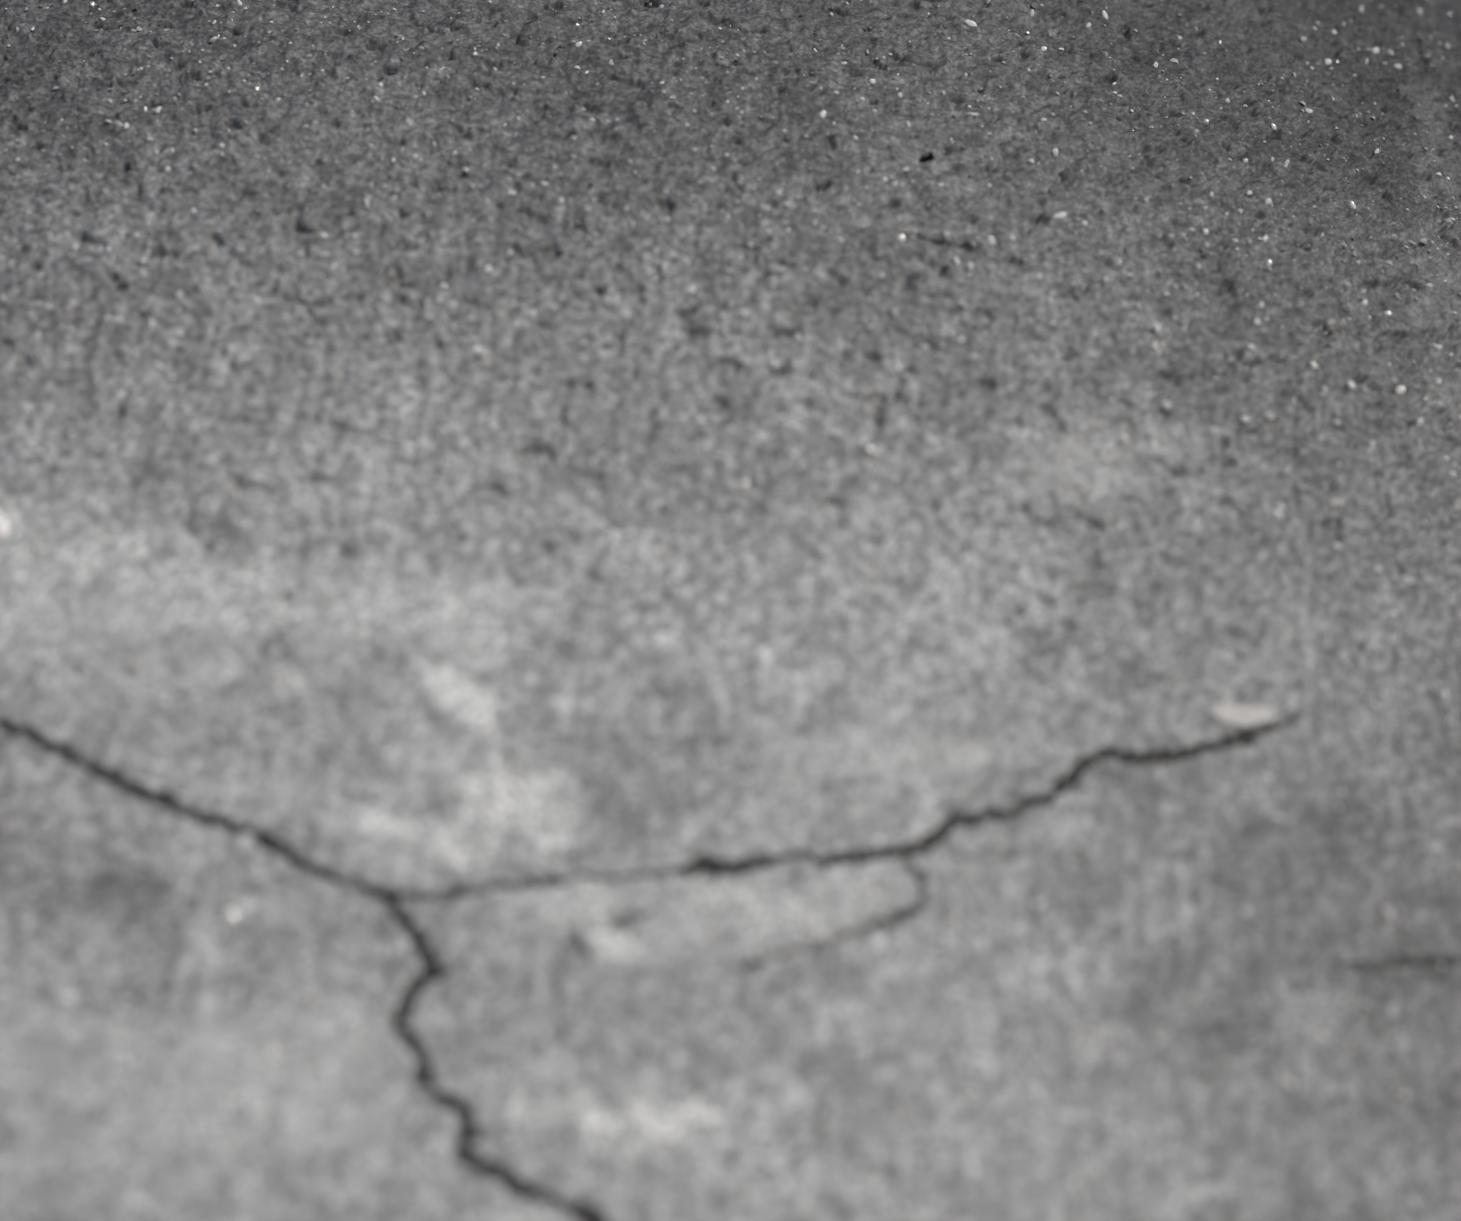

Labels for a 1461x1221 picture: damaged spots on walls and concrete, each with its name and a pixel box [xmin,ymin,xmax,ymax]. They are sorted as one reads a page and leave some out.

crack [0,712,1299,1221]